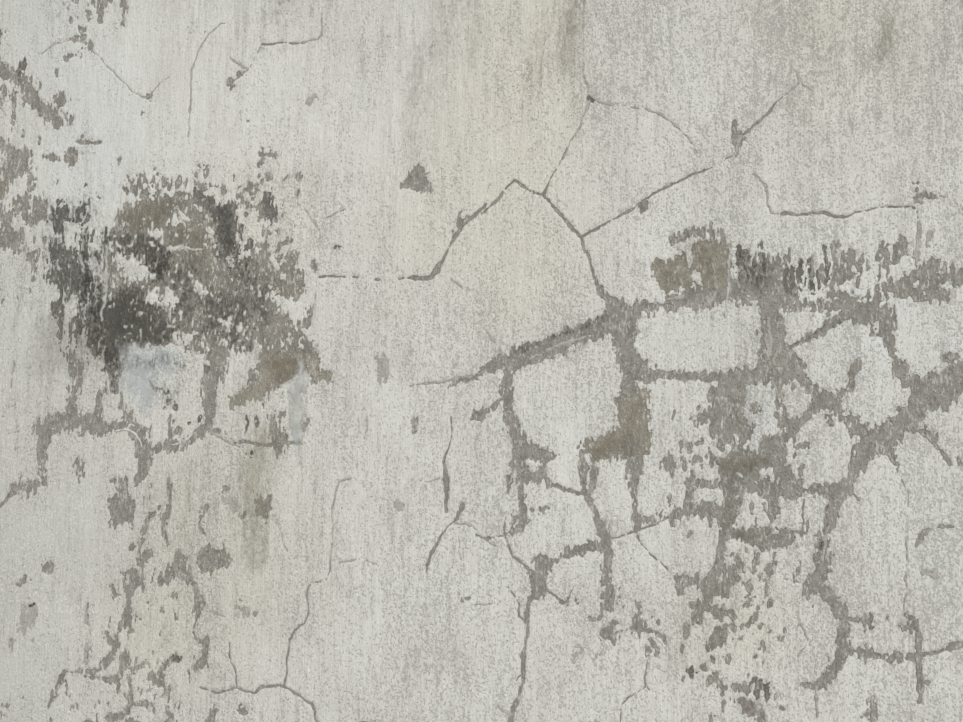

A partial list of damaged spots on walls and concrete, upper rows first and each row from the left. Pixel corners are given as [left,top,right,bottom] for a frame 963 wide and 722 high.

crack [226,12,323,90]
crack [295,0,963,315]
water stain [713,221,937,318]
crack [0,474,40,508]
peeling [0,56,334,722]
crack [409,328,503,386]
crack [420,416,498,572]
crack [918,428,963,466]
crack [199,478,377,722]
crack [498,552,574,722]
crack [797,622,809,657]
crack [846,524,963,704]